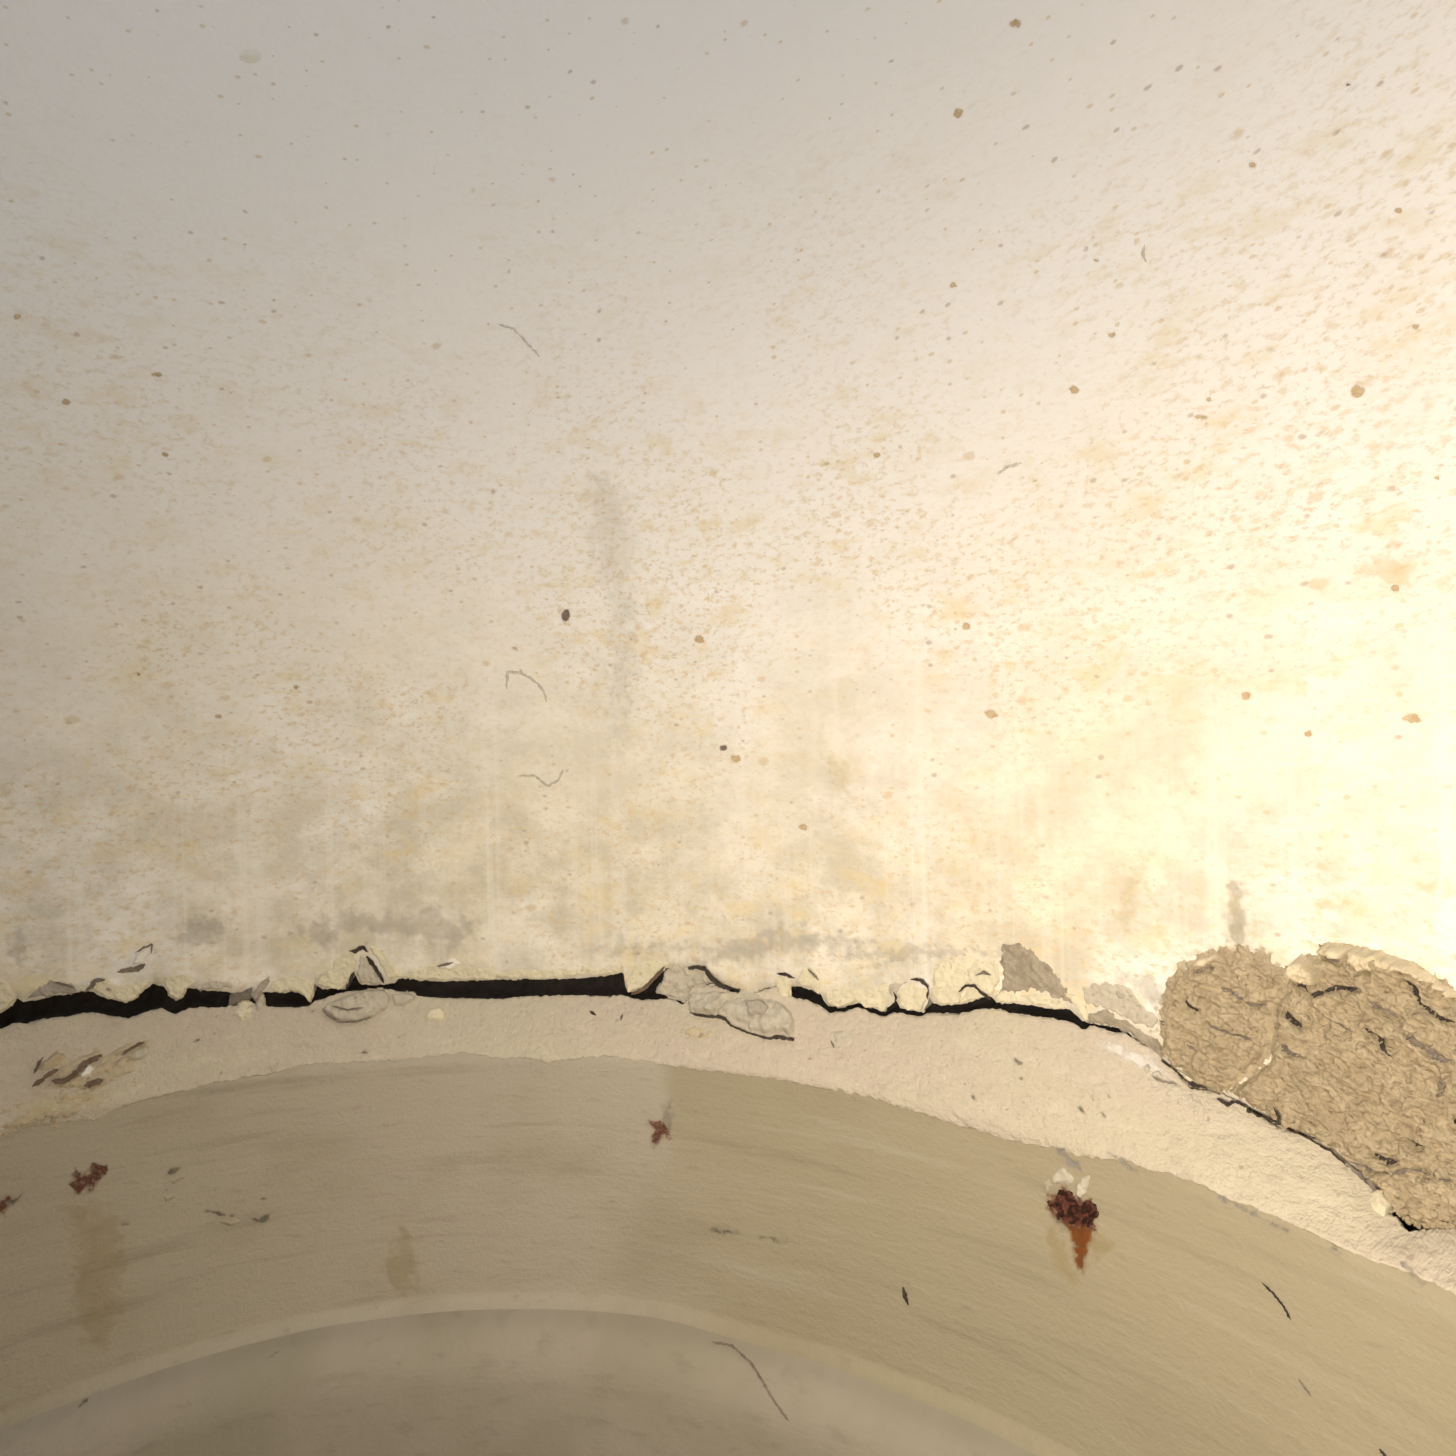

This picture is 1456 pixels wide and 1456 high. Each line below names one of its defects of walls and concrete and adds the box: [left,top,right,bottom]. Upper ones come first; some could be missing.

peeling [0,943,669,1021]
crack [0,946,794,1041]
peeling [680,984,728,1039]
spalling [32,1039,152,1090]
crack [777,972,1383,1194]
spalling [776,941,1456,1230]
corrosion [69,1163,108,1194]
corrosion [1047,1187,1099,1269]